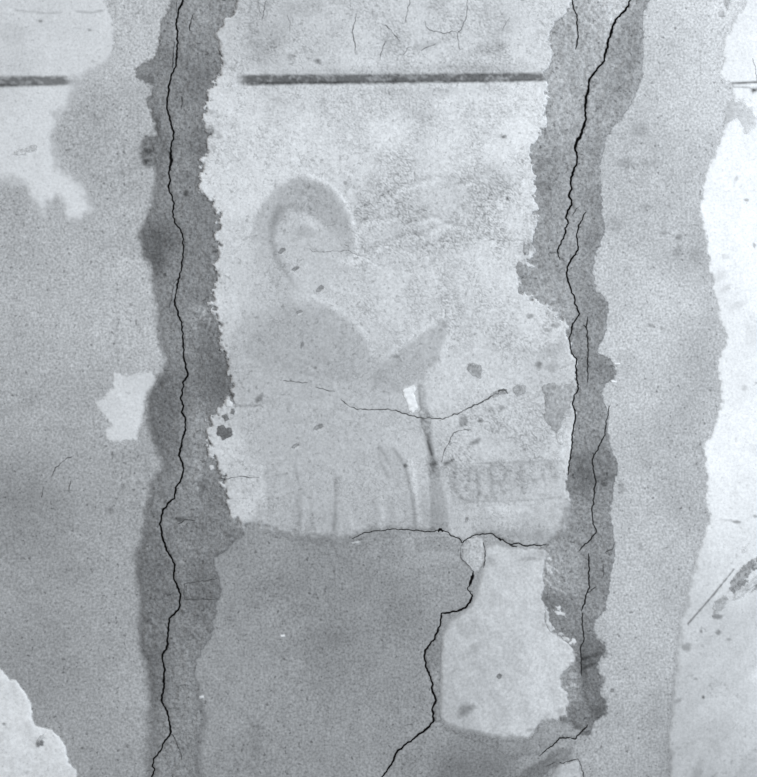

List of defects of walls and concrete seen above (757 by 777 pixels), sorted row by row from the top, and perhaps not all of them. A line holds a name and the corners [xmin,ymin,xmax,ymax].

spalling [516,245,533,293]
crack [557,0,631,475]
crack [151,0,217,777]
spalling [217,393,235,440]
crack [284,380,507,462]
crack [579,406,614,676]
crack [352,528,545,777]
spalling [545,606,576,644]
peeling [688,560,757,624]
crack [540,724,588,777]